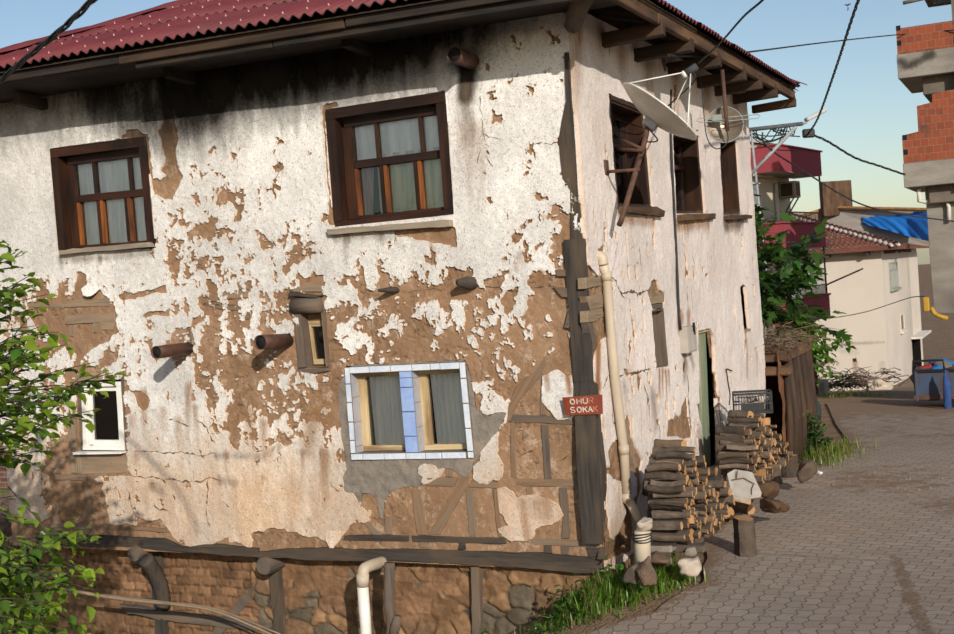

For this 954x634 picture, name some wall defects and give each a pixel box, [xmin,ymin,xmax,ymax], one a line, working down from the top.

peeling [487,86,503,124]
crack [612,247,650,297]
peeling [0,102,650,567]
crack [128,406,229,526]